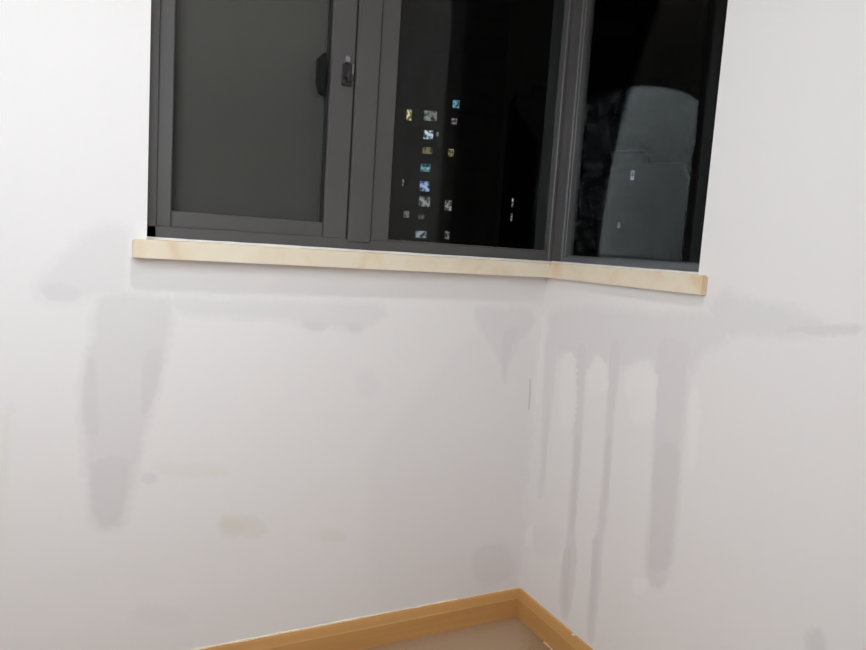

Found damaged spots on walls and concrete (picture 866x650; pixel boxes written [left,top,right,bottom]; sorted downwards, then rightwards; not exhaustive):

water stain [27,217,390,541]
water stain [359,284,865,645]